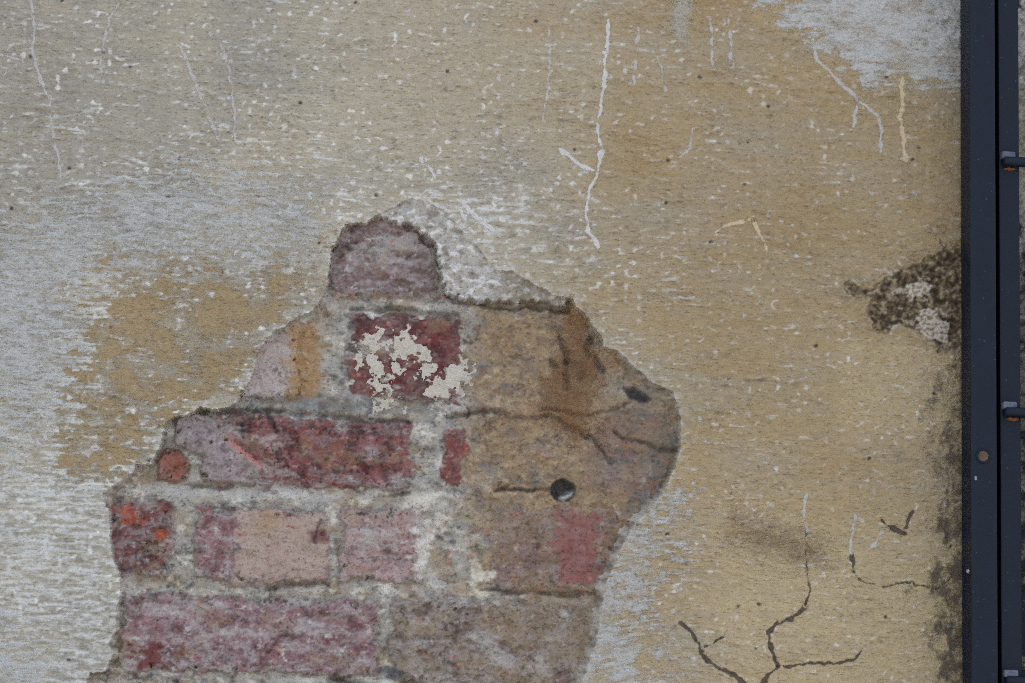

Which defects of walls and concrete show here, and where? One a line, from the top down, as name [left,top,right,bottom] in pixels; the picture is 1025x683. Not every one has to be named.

peeling [753,0,961,96]
spalling [842,238,961,355]
spalling [86,197,682,683]
crack [678,493,861,683]